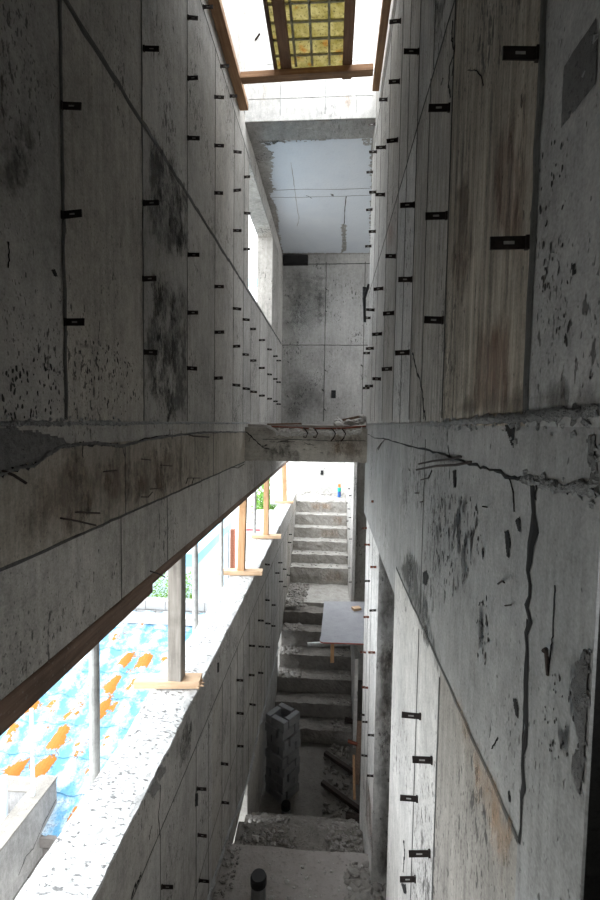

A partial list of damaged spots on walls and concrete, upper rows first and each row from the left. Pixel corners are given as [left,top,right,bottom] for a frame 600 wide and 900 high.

leakage [147,146,187,253]
spalling [0,341,250,472]
crack [0,431,269,478]
leakage [147,284,187,419]
spalling [272,401,600,497]
crack [368,434,599,844]
spalling [544,648,592,795]